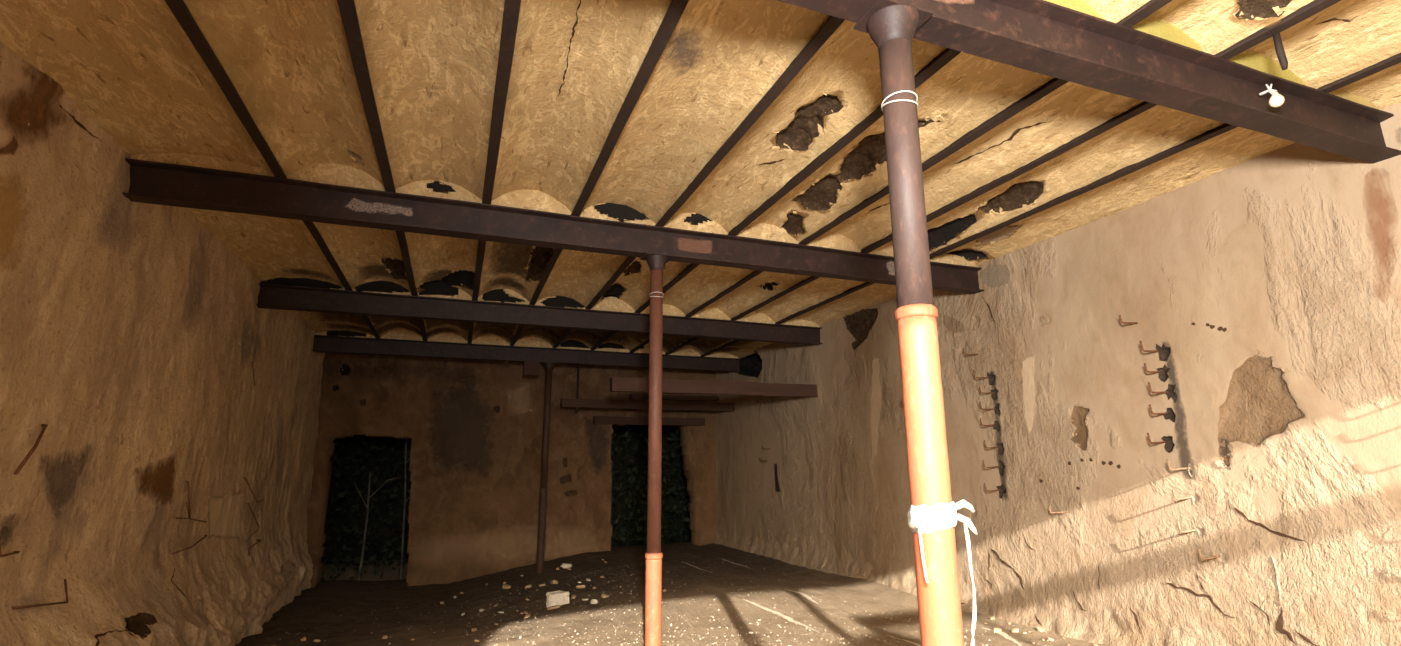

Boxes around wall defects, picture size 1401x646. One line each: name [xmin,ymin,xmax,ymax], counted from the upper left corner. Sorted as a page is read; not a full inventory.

spalling [1231,0,1292,25]
damp [0,71,63,155]
spalling [772,91,844,155]
spalling [918,112,947,128]
crack [950,121,1052,166]
spalling [779,132,887,239]
spalling [927,180,1045,262]
spalling [1215,350,1306,468]
damp [137,457,175,503]